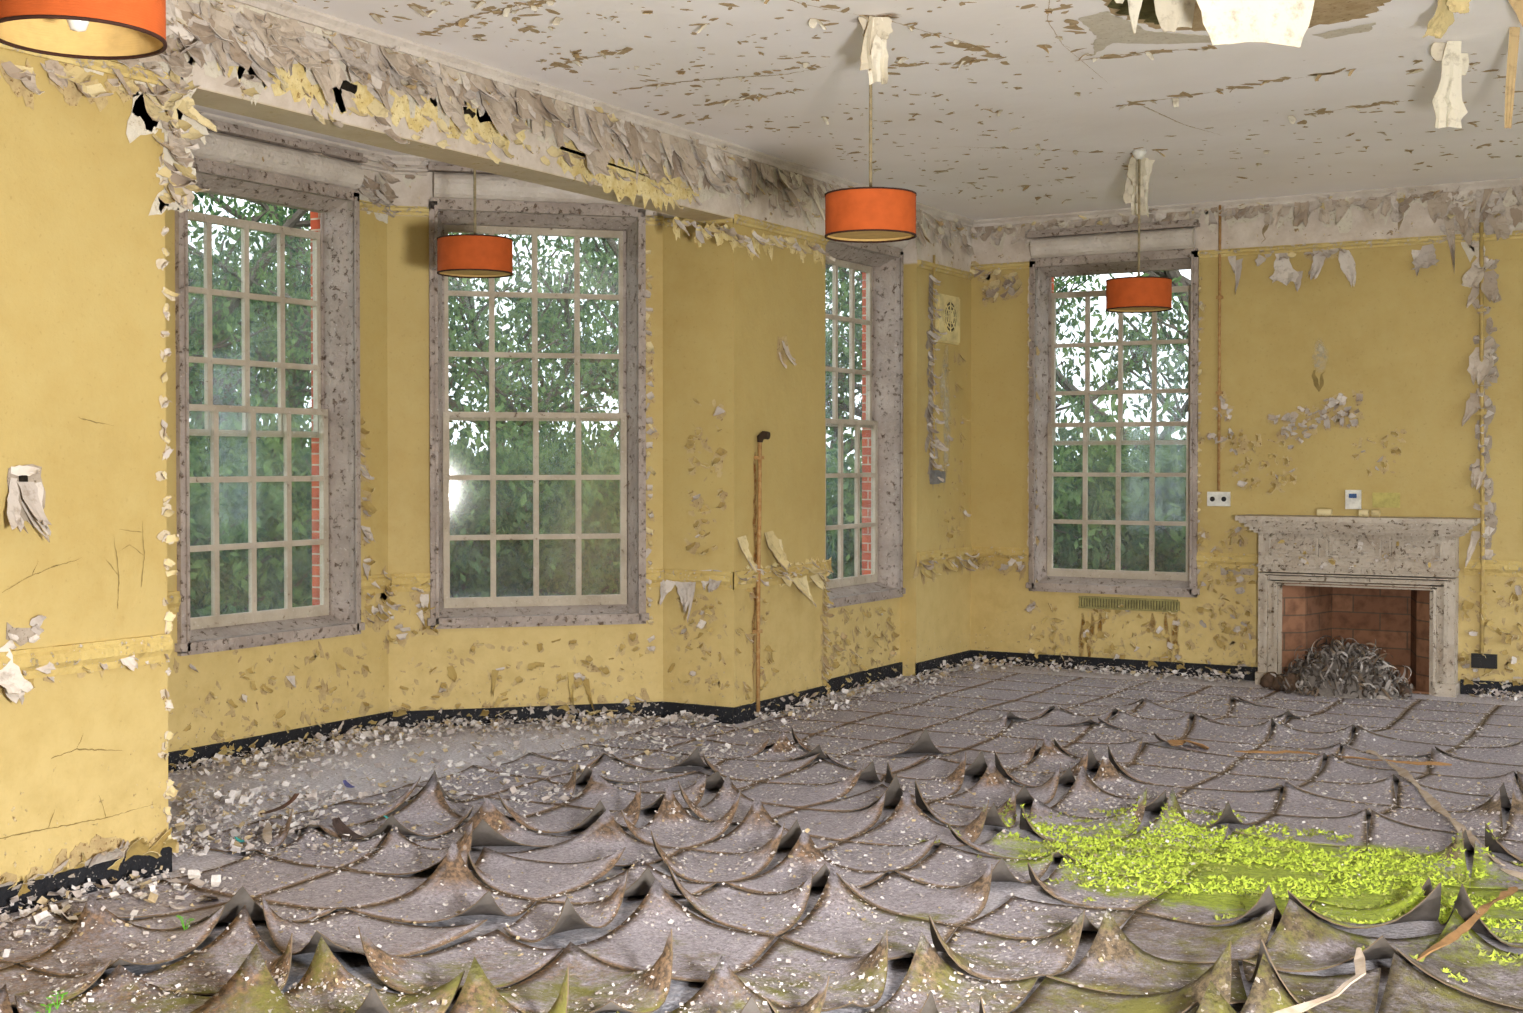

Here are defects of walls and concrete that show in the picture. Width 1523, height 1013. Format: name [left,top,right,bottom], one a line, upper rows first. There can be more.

flaking render [0,0,1085,270]
flaking render [1070,0,1391,56]
peeling [0,267,1523,1013]
peeling [913,147,1523,691]